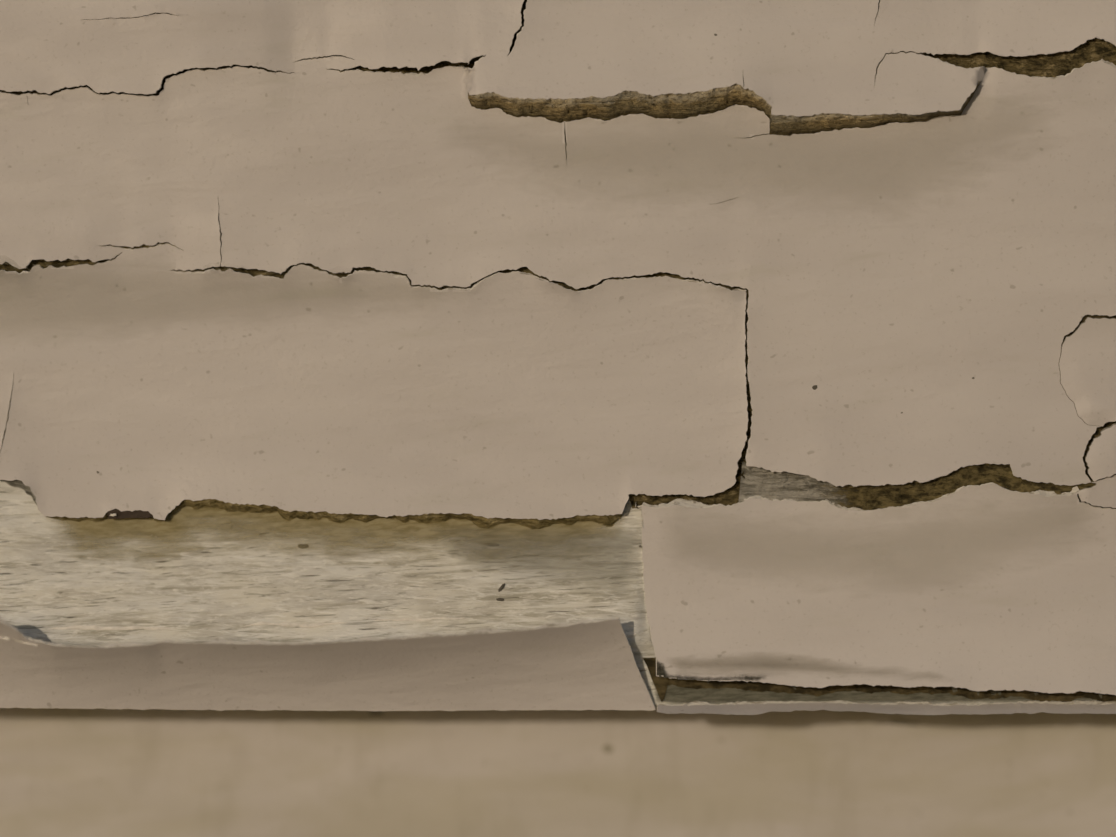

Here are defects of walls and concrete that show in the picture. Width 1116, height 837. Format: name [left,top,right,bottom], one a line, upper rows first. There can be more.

crack [0,0,527,99]
peeling [467,0,984,136]
crack [0,221,1116,510]
peeling [0,255,1116,715]